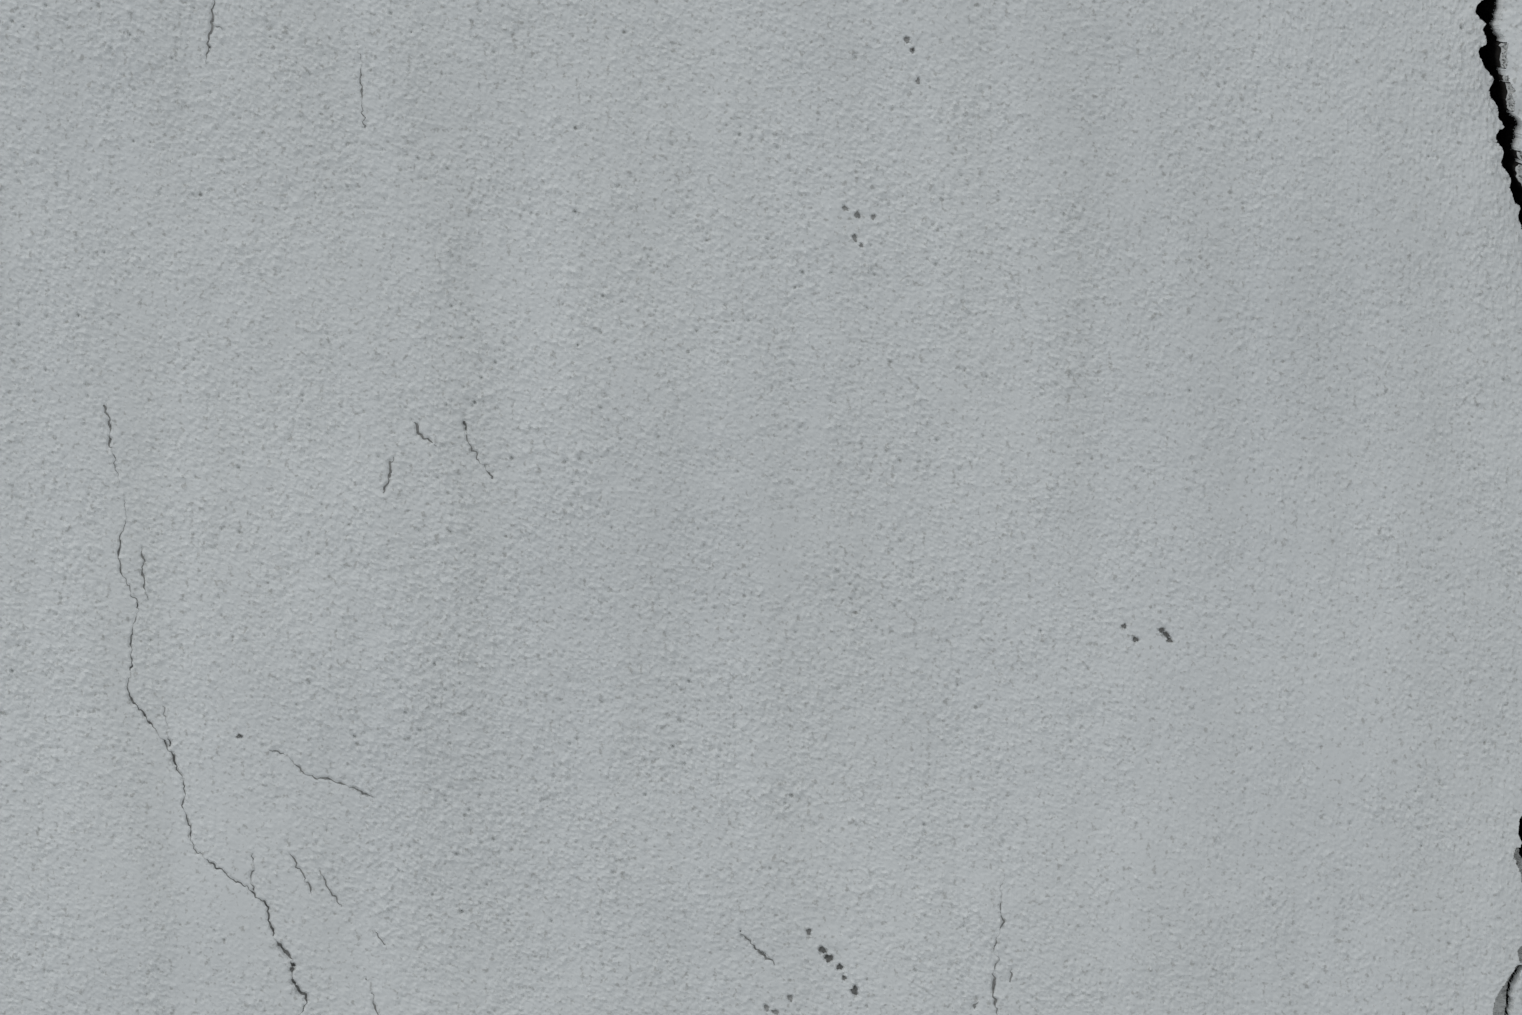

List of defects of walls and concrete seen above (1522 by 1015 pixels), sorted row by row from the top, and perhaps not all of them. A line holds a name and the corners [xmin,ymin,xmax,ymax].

crack [1475,0,1522,229]
crack [1514,816,1522,882]
crack [1493,946,1522,1015]